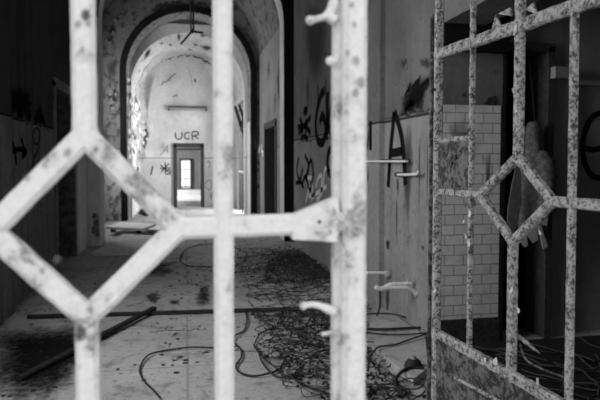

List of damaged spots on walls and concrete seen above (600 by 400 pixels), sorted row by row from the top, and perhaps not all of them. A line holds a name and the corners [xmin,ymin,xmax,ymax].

peeling [105,76,148,171]